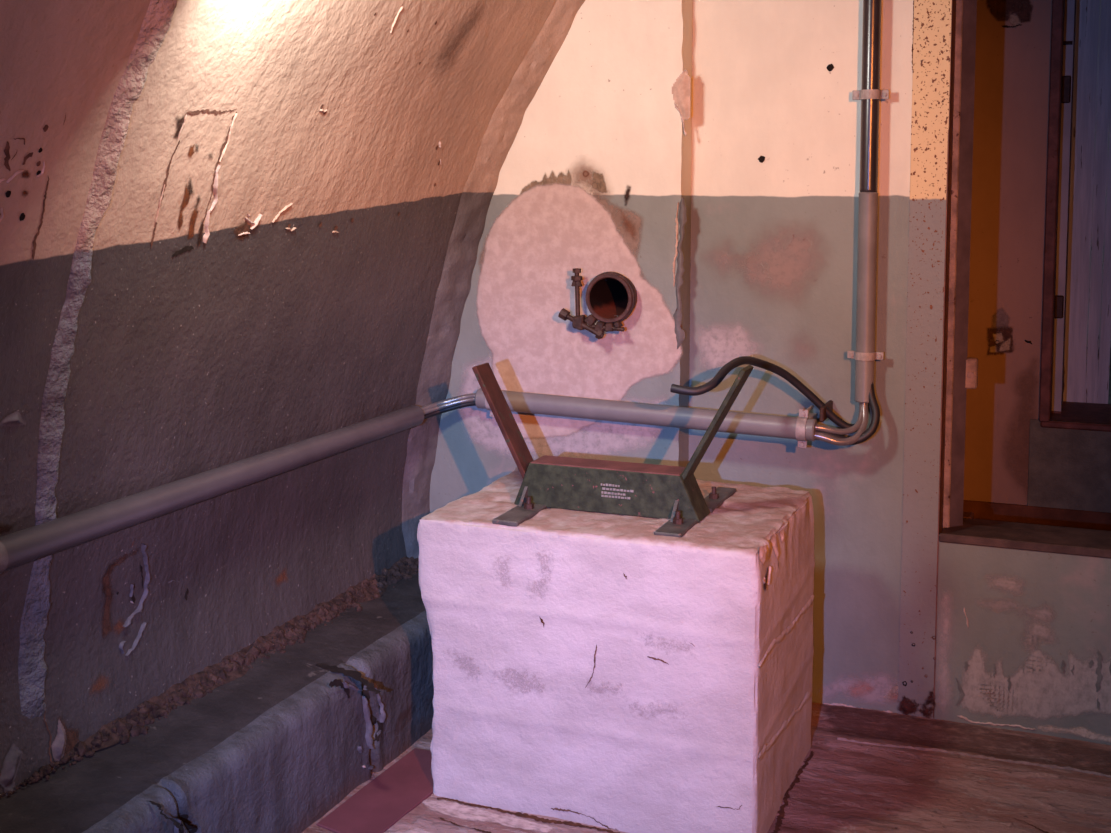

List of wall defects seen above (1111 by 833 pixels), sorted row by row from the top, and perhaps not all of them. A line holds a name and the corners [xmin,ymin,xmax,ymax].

spalling [0,138,46,222]
spalling [672,198,687,349]
spalling [102,541,151,656]
crack [316,663,386,770]
peeling [826,707,1111,773]
crack [149,801,198,833]
crack [438,817,491,833]
crack [551,808,610,829]